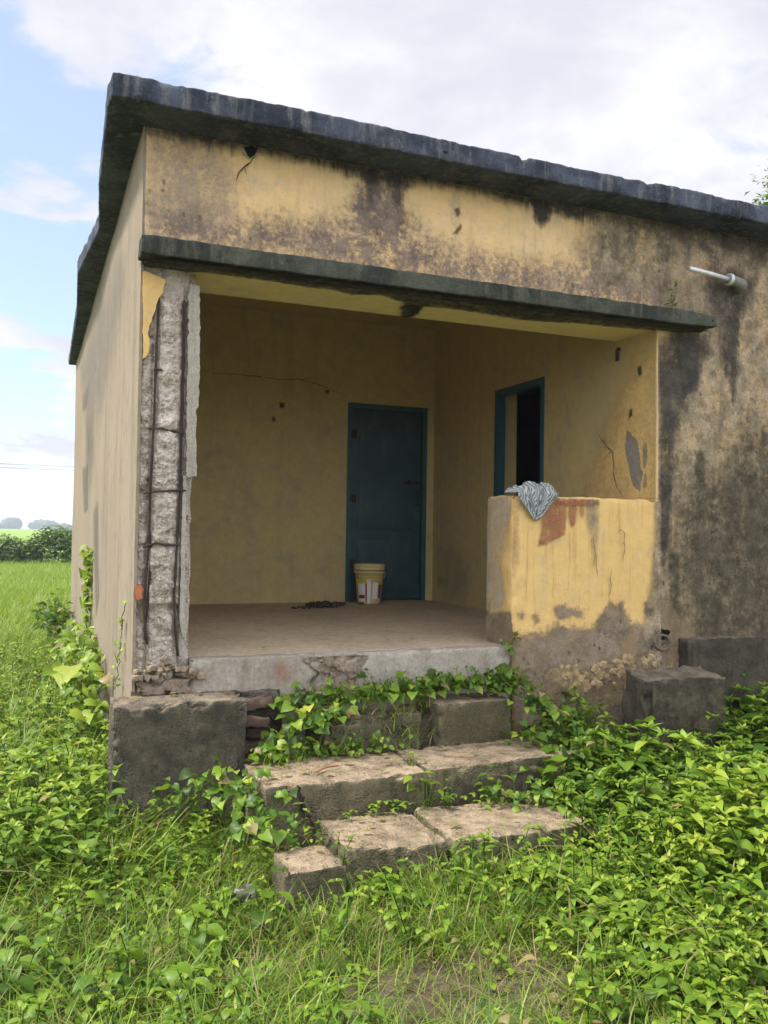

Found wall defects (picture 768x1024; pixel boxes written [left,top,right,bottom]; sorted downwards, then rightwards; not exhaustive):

spalling [132,267,206,696]
damp [141,127,768,667]
crack [597,432,658,499]
peeling [625,431,647,491]
spalling [304,655,368,690]
flaking render [513,598,660,738]